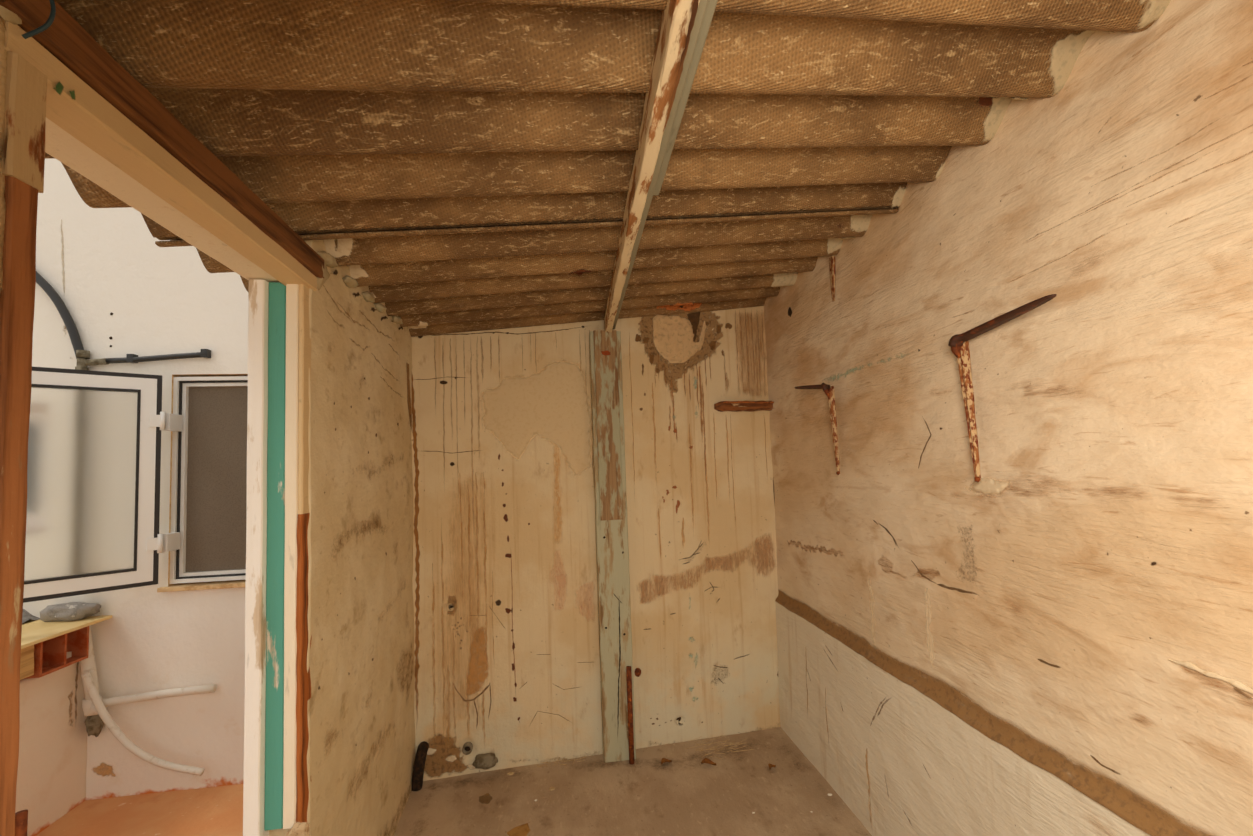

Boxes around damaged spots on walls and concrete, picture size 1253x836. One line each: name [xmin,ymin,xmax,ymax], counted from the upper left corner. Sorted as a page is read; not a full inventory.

spalling [635,311,732,393]
leakage [641,538,774,602]
leakage [433,609,494,741]
spalling [424,734,476,777]